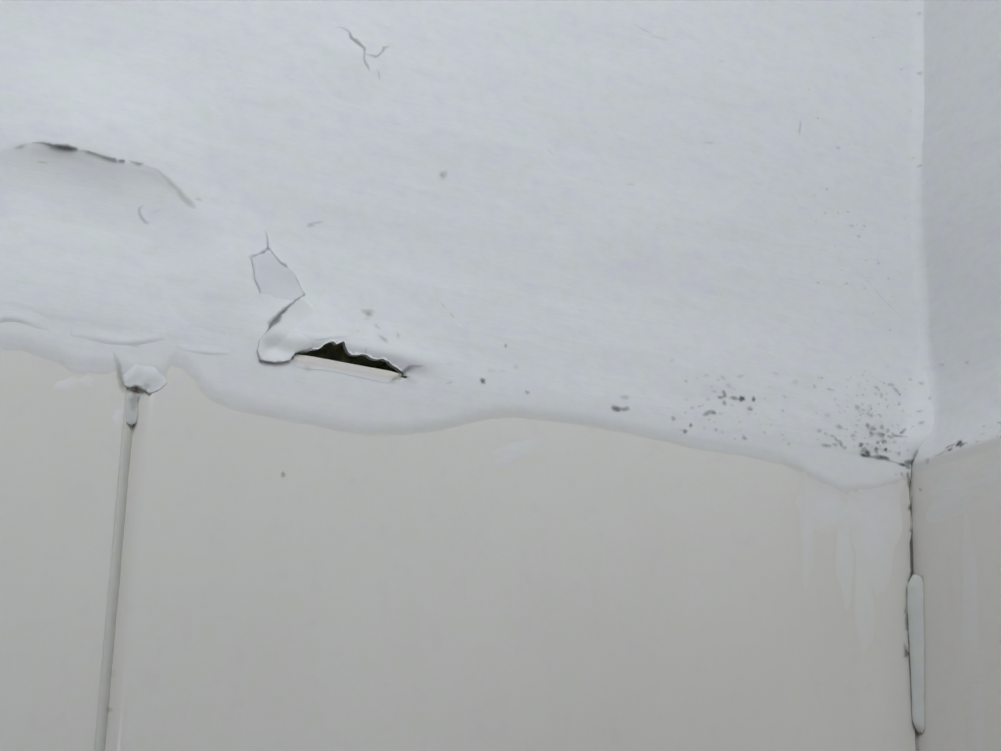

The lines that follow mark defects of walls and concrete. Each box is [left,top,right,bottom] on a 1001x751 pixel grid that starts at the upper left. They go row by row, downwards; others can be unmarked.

crack [51,143,76,151]
spalling [225,248,468,386]